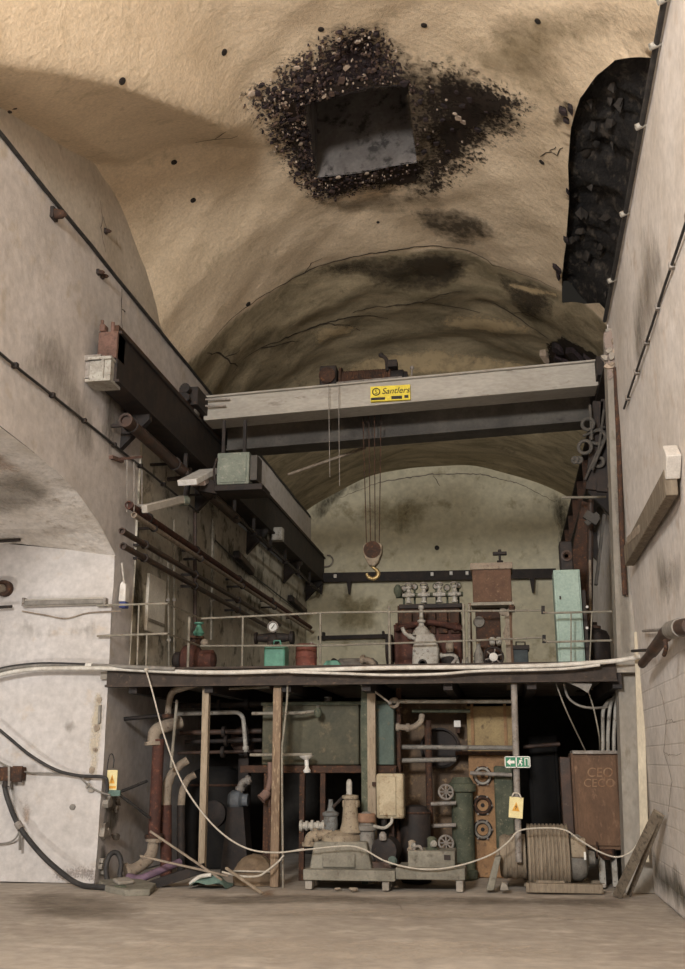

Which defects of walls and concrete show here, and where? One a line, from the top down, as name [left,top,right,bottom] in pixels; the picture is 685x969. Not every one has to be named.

peeling [239,25,507,202]
spalling [552,57,651,309]
crack [204,245,556,370]